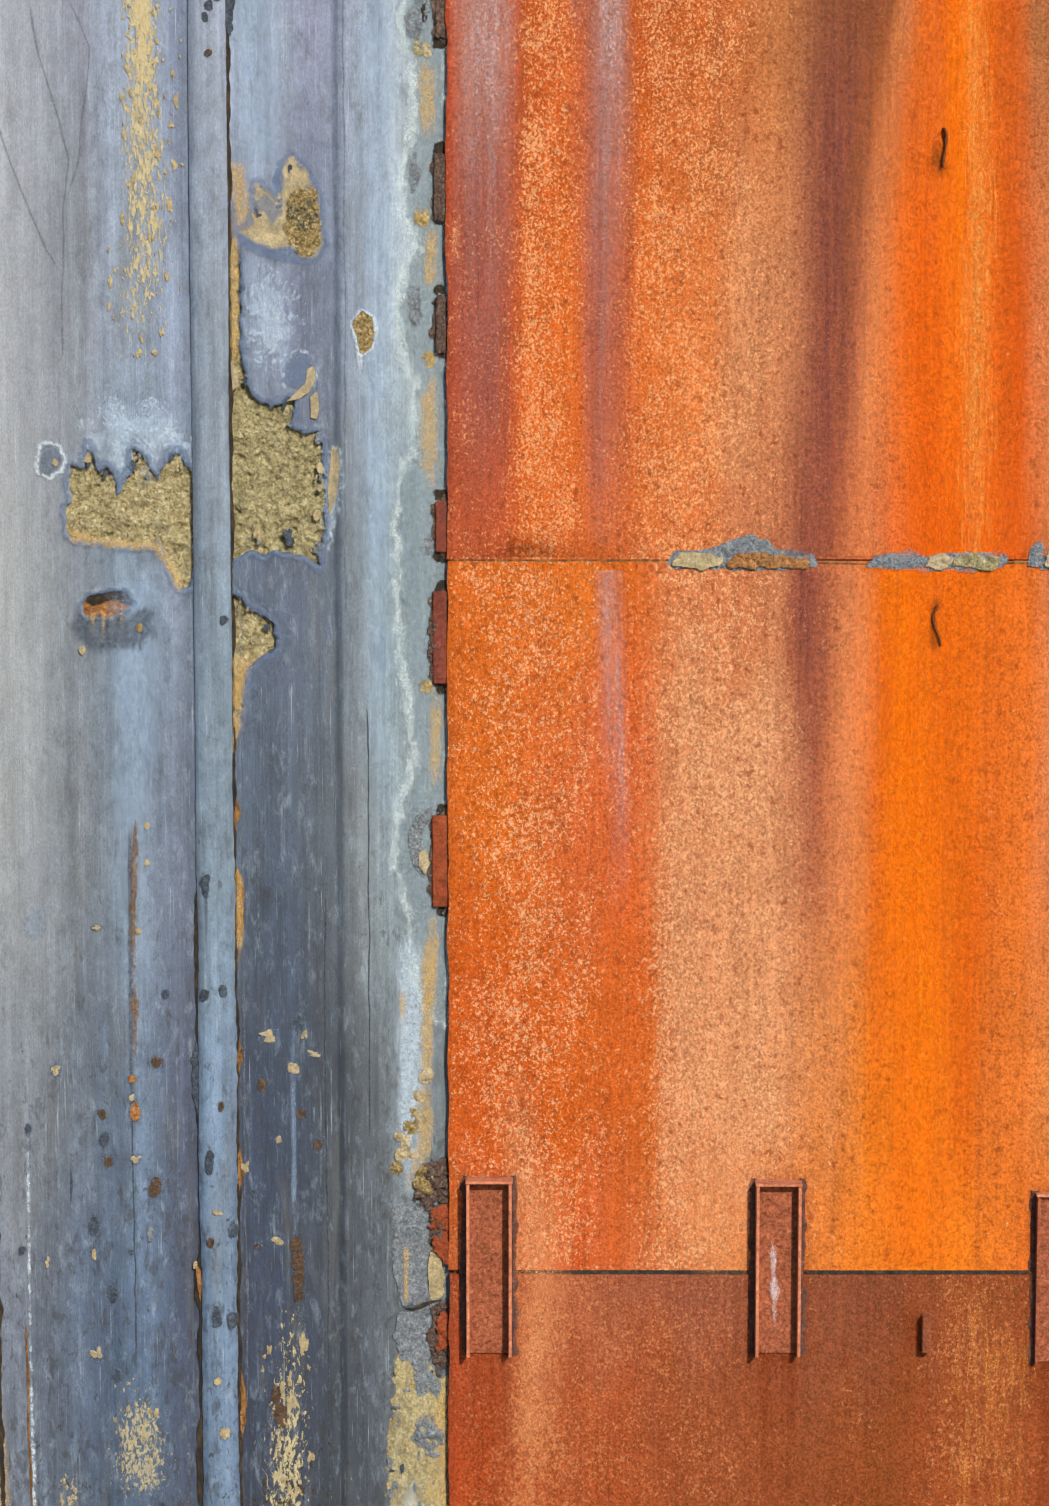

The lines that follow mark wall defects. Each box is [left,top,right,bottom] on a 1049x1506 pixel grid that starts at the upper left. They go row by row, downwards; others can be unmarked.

peeling [107,0,189,371]
spalling [231,155,327,564]
spalling [52,450,194,589]
peeling [668,533,818,571]
peeling [866,549,1008,573]
peeling [1028,542,1049,571]
spalling [220,589,285,738]
peeling [261,1310,315,1506]
peeling [386,1202,450,1506]